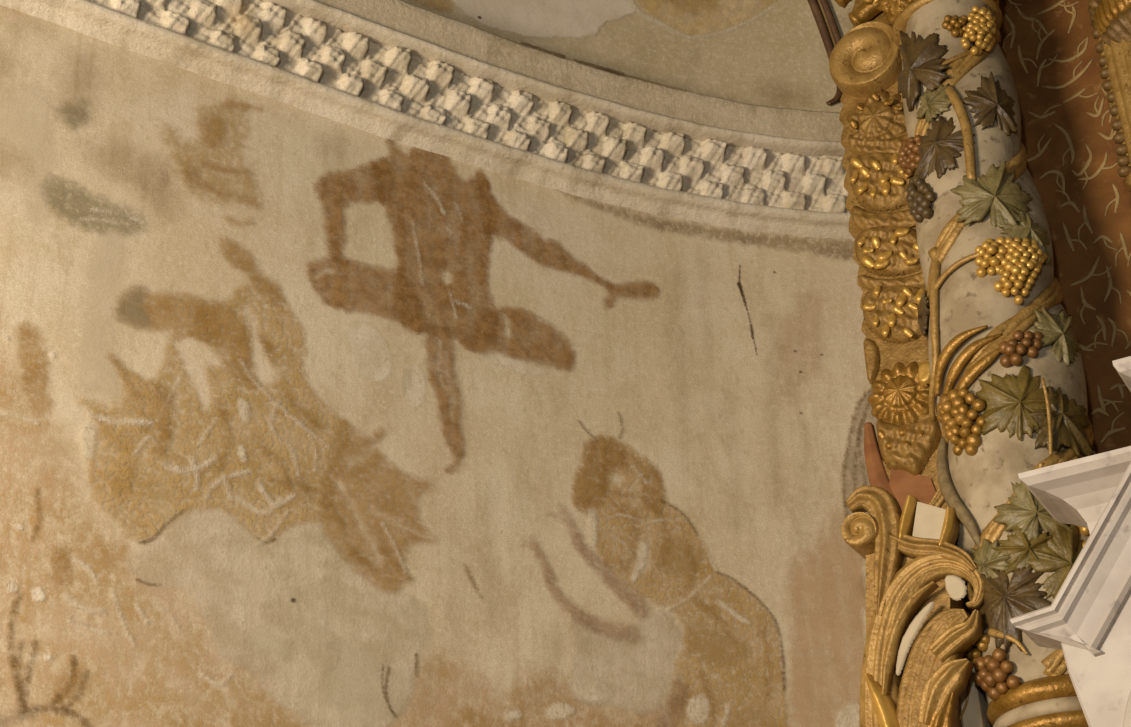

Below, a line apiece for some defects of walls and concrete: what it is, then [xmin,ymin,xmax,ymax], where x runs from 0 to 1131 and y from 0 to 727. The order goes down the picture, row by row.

flaking render [452,0,635,38]
crack [521,42,686,91]
crack [737,265,756,350]